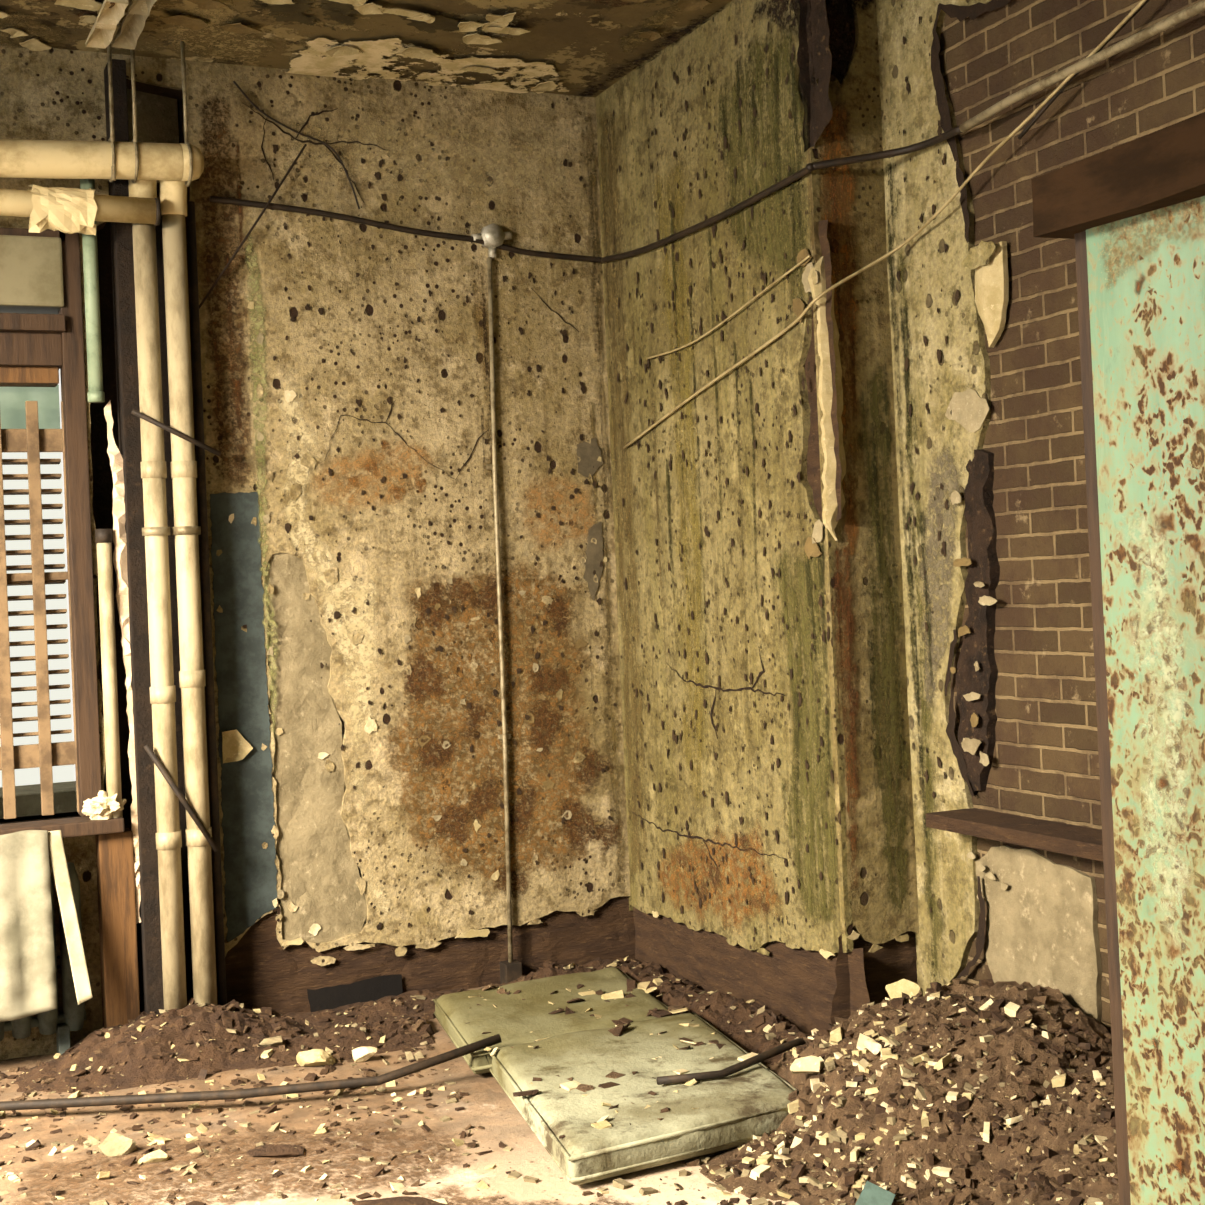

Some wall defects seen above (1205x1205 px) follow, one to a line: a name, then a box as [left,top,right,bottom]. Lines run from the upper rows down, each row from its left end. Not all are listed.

peeling [252,0,569,94]
leakage [582,7,724,97]
flaking render [673,0,873,199]
leakage [472,266,499,523]
flaking render [210,82,917,1035]
leakage [525,116,650,885]
leakage [654,175,706,795]
leakage [806,546,826,669]
rust [822,104,860,888]
flaking render [905,449,1000,803]
flaking render [942,389,990,433]
peeling [961,241,1009,348]